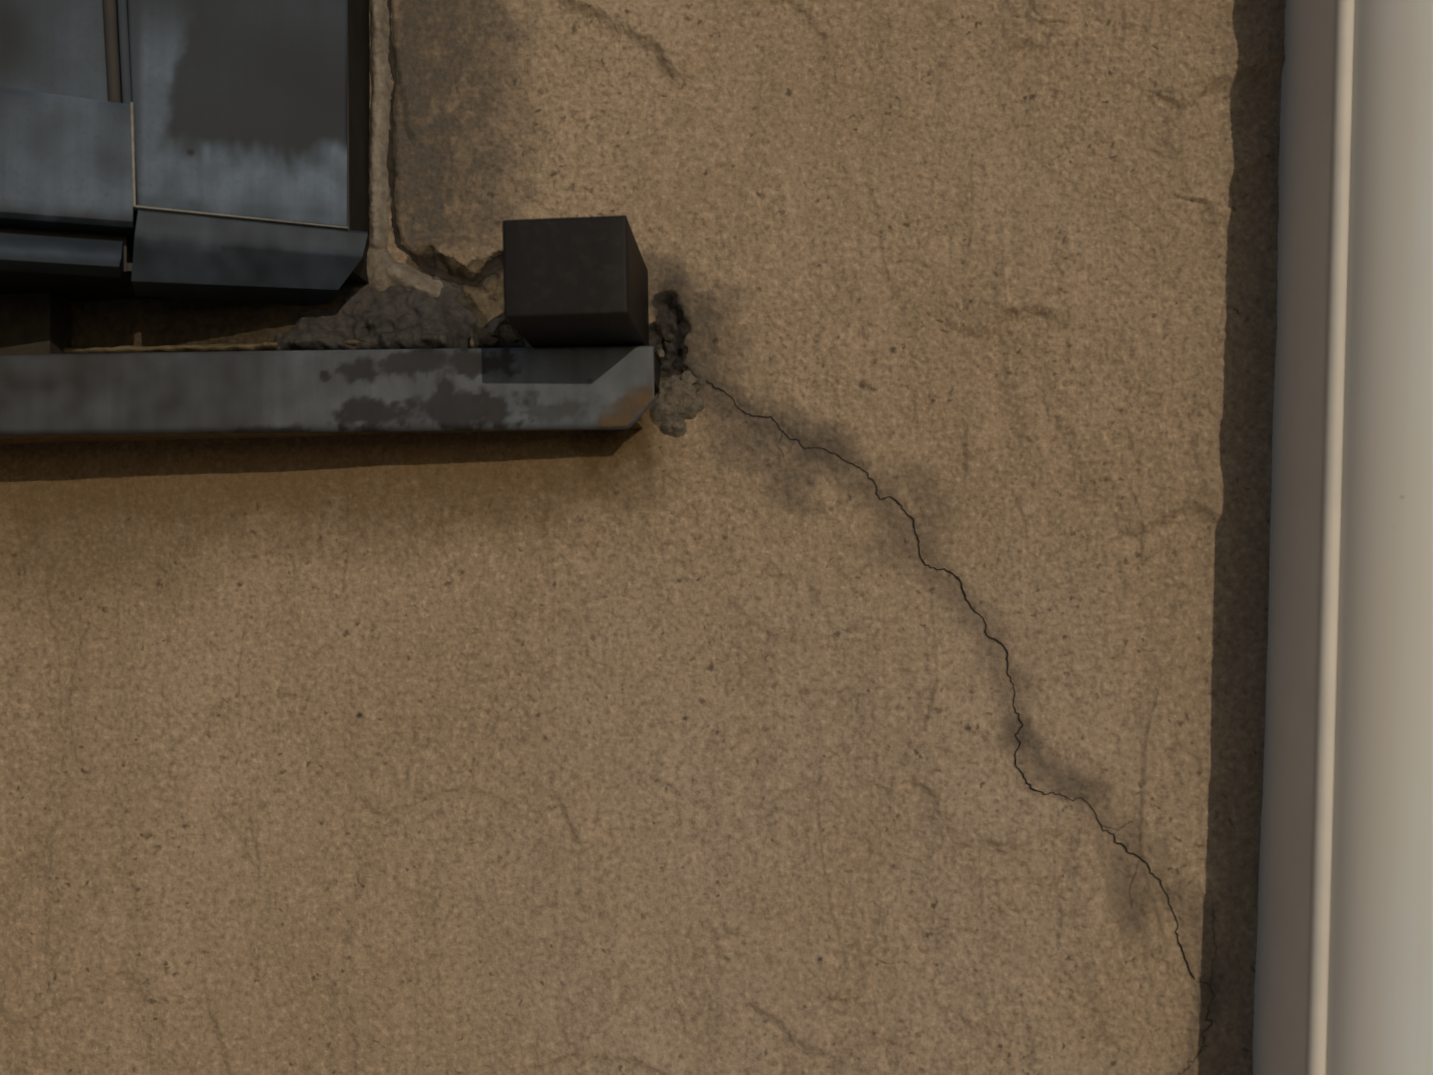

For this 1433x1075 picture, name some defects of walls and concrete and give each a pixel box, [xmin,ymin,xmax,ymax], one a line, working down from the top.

spalling [405,245,532,348]
spalling [649,290,707,438]
crack [672,372,1215,1031]